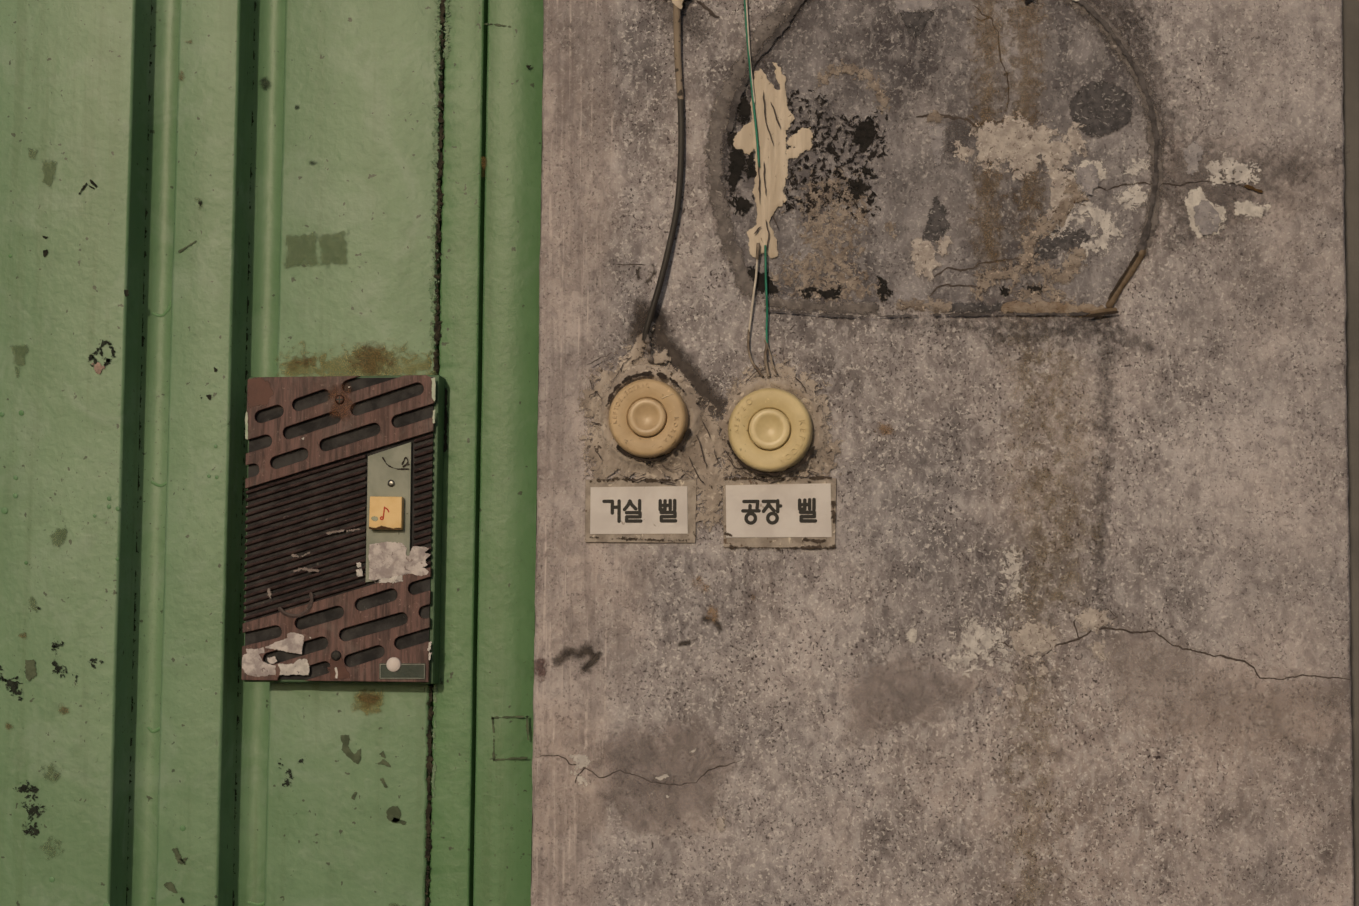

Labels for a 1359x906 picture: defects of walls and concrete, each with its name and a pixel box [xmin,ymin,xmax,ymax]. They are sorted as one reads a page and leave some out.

peeling [733,120,753,155]
spalling [768,127,887,312]
flaking render [951,109,1151,305]
flaking render [1181,141,1271,239]
flaking render [910,235,953,282]
peeling [88,340,116,374]
peeling [0,641,103,701]
crack [988,608,1350,680]
crack [537,755,739,786]
peeling [12,766,63,852]